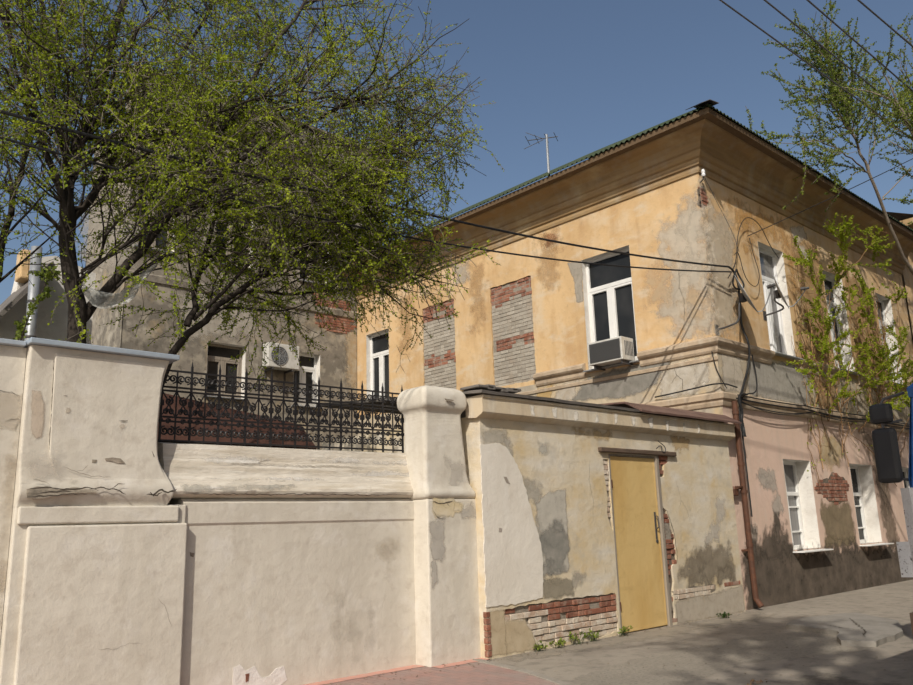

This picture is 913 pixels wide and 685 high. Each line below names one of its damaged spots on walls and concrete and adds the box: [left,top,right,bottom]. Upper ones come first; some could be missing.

flaking render [313,293,357,387]
crack [48,360,56,450]
crack [66,466,124,494]
crack [147,488,401,496]
flaking render [814,430,856,549]
peeling [430,443,618,657]
flaking render [663,510,740,623]
peeling [232,664,287,685]